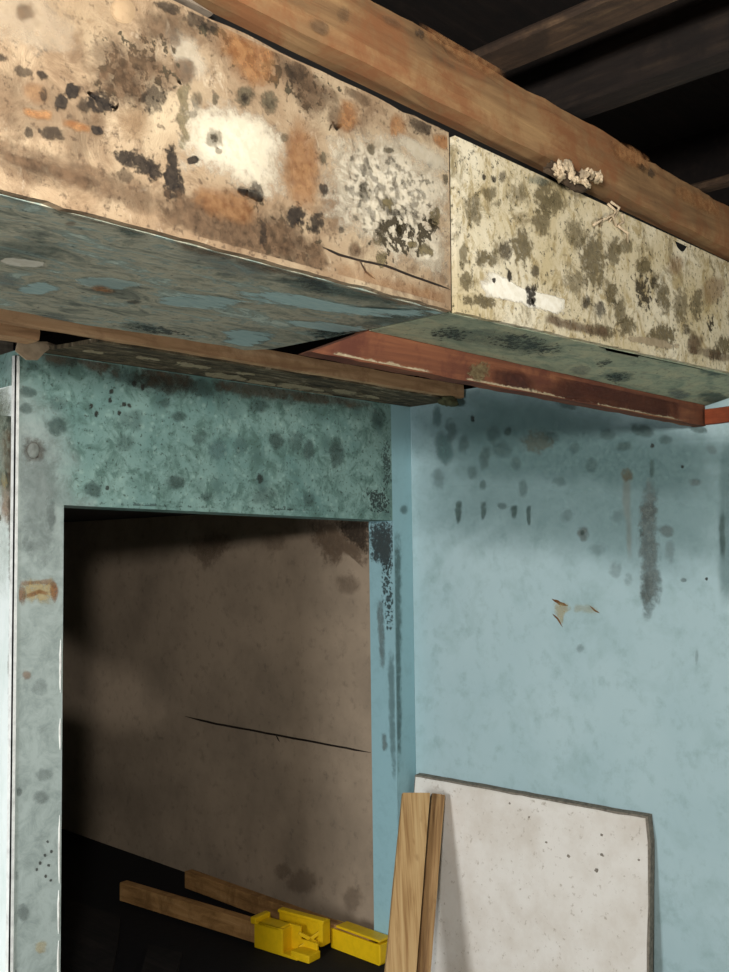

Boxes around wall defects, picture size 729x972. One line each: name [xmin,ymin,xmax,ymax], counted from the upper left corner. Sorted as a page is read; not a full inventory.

leakage [25,127,63,139]
leakage [41,2,440,325]
leakage [459,173,563,306]
peeling [2,258,43,267]
peeling [79,278,140,289]
crack [323,247,449,289]
leakage [579,229,676,350]
peeling [223,330,273,346]
peeling [159,291,440,332]
leakage [688,290,729,375]
leakage [641,485,660,601]
rust [19,582,58,601]